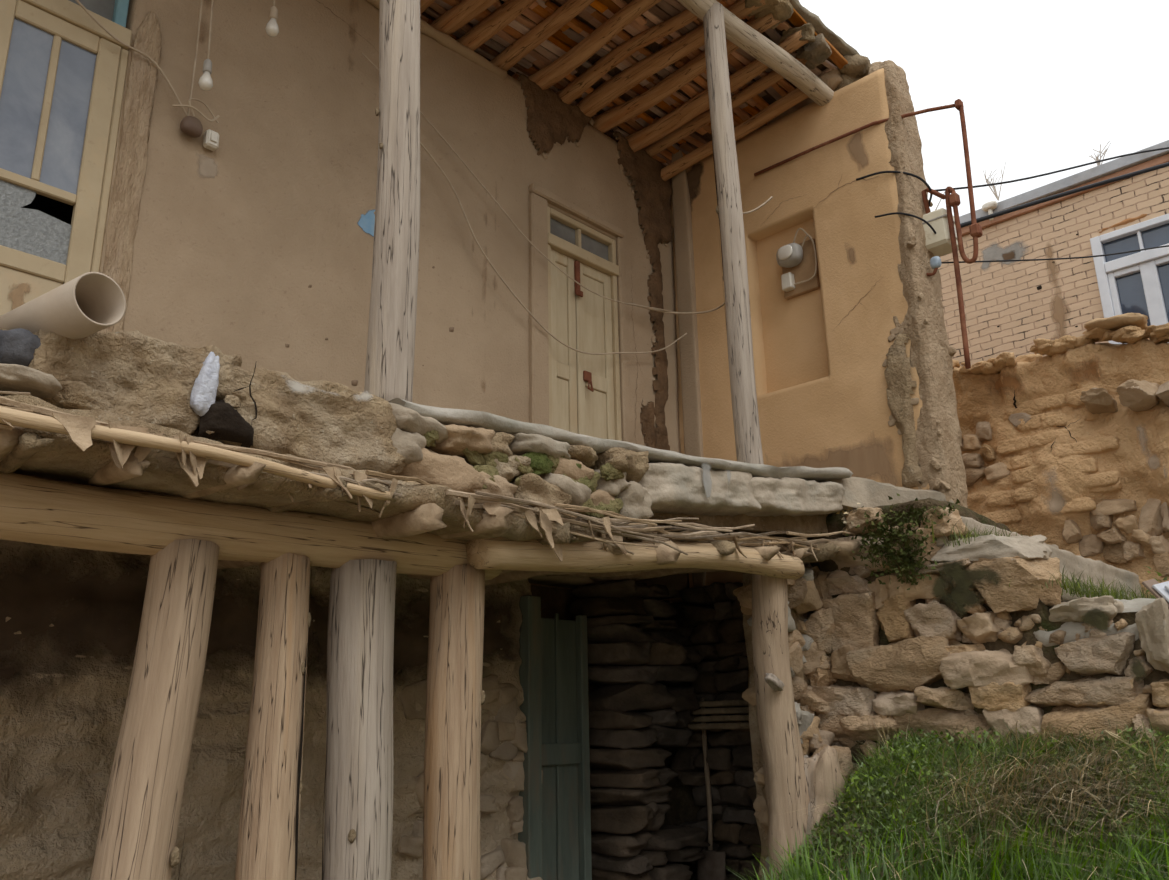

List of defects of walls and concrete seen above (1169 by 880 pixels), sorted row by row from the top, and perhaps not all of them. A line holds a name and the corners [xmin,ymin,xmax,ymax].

spalling [516,72,594,159]
spalling [613,131,672,451]
spalling [882,327,923,488]